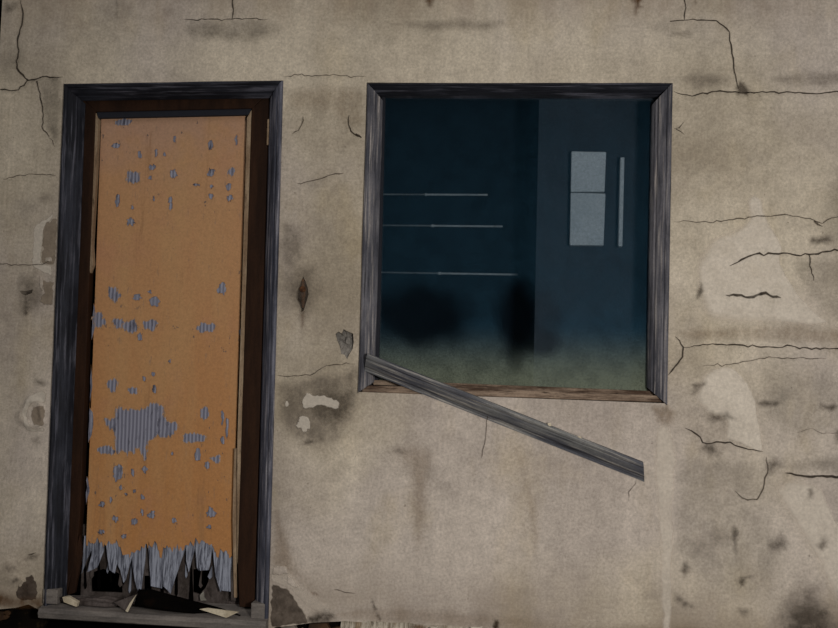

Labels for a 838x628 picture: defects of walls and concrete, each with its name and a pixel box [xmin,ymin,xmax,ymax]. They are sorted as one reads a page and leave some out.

crack [670,0,838,97]
crack [0,5,60,147]
crack [680,214,837,227]
spalling [42,219,57,264]
crack [730,249,838,277]
crack [726,291,781,299]
spalling [336,330,354,358]
crack [669,336,838,374]
spalling [31,406,45,426]
crack [686,428,838,501]
spalling [16,575,37,600]
spalling [271,566,332,627]